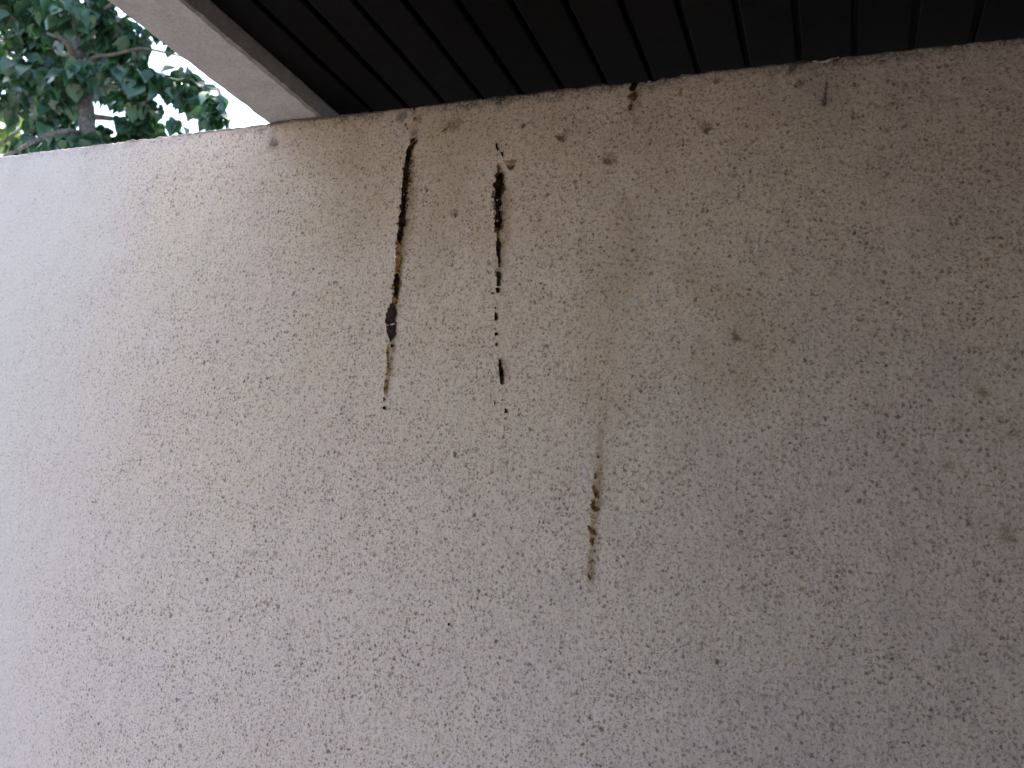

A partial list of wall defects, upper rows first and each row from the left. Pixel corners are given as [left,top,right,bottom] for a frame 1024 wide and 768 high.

crack [383,107,418,409]
crack [491,141,507,413]
rust [587,455,600,581]